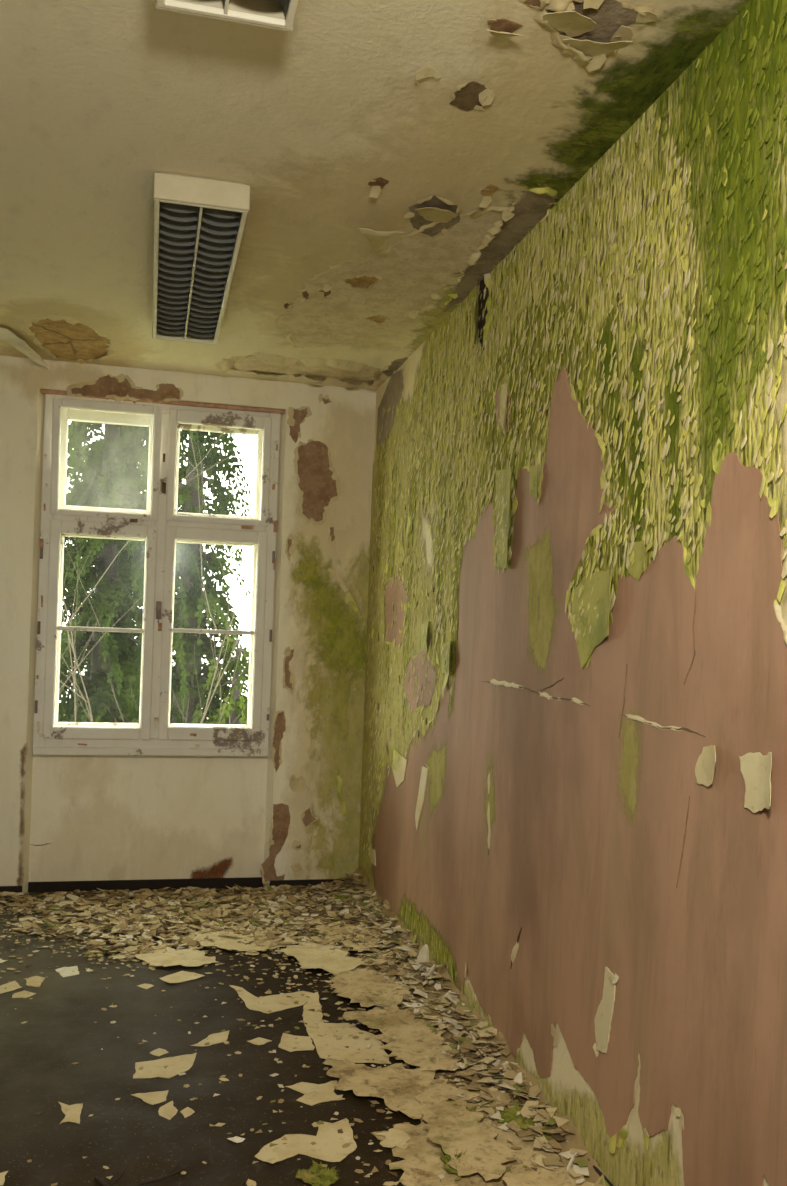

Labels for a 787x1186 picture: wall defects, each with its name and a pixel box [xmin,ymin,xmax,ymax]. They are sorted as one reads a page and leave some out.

spalling [487,0,657,72]
spalling [449,81,496,111]
damp [551,107,638,150]
damp [520,172,585,187]
peeling [443,184,559,350]
spalling [19,315,117,364]
peeling [66,373,184,402]
peeling [214,352,408,550]
damp [599,314,645,541]
damp [666,349,684,543]
peeling [350,367,787,1186]
peeling [260,803,319,884]